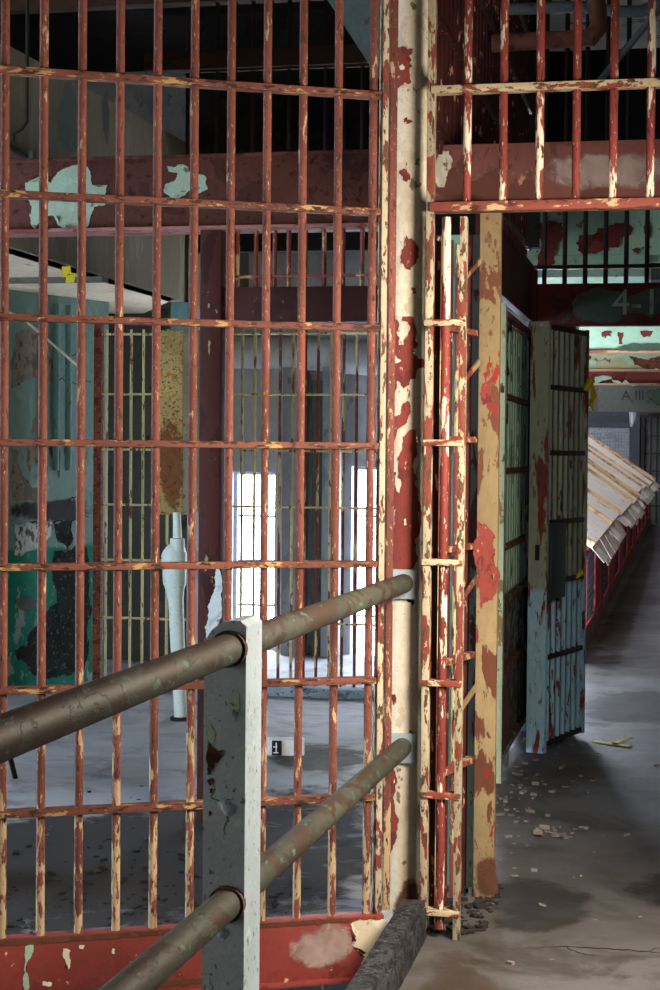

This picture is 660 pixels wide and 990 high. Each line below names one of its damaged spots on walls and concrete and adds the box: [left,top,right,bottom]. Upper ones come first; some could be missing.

peeling [25,165,107,229]
peeling [164,164,208,198]
peeling [400,236,419,270]
peeling [395,316,425,390]
rust [160,419,183,512]
peeling [393,401,422,569]
peeling [473,521,500,606]
flaking render [14,521,92,679]
damp [498,880,589,931]
peeling [23,945,34,990]
peeling [63,945,85,969]
peeling [351,919,388,965]